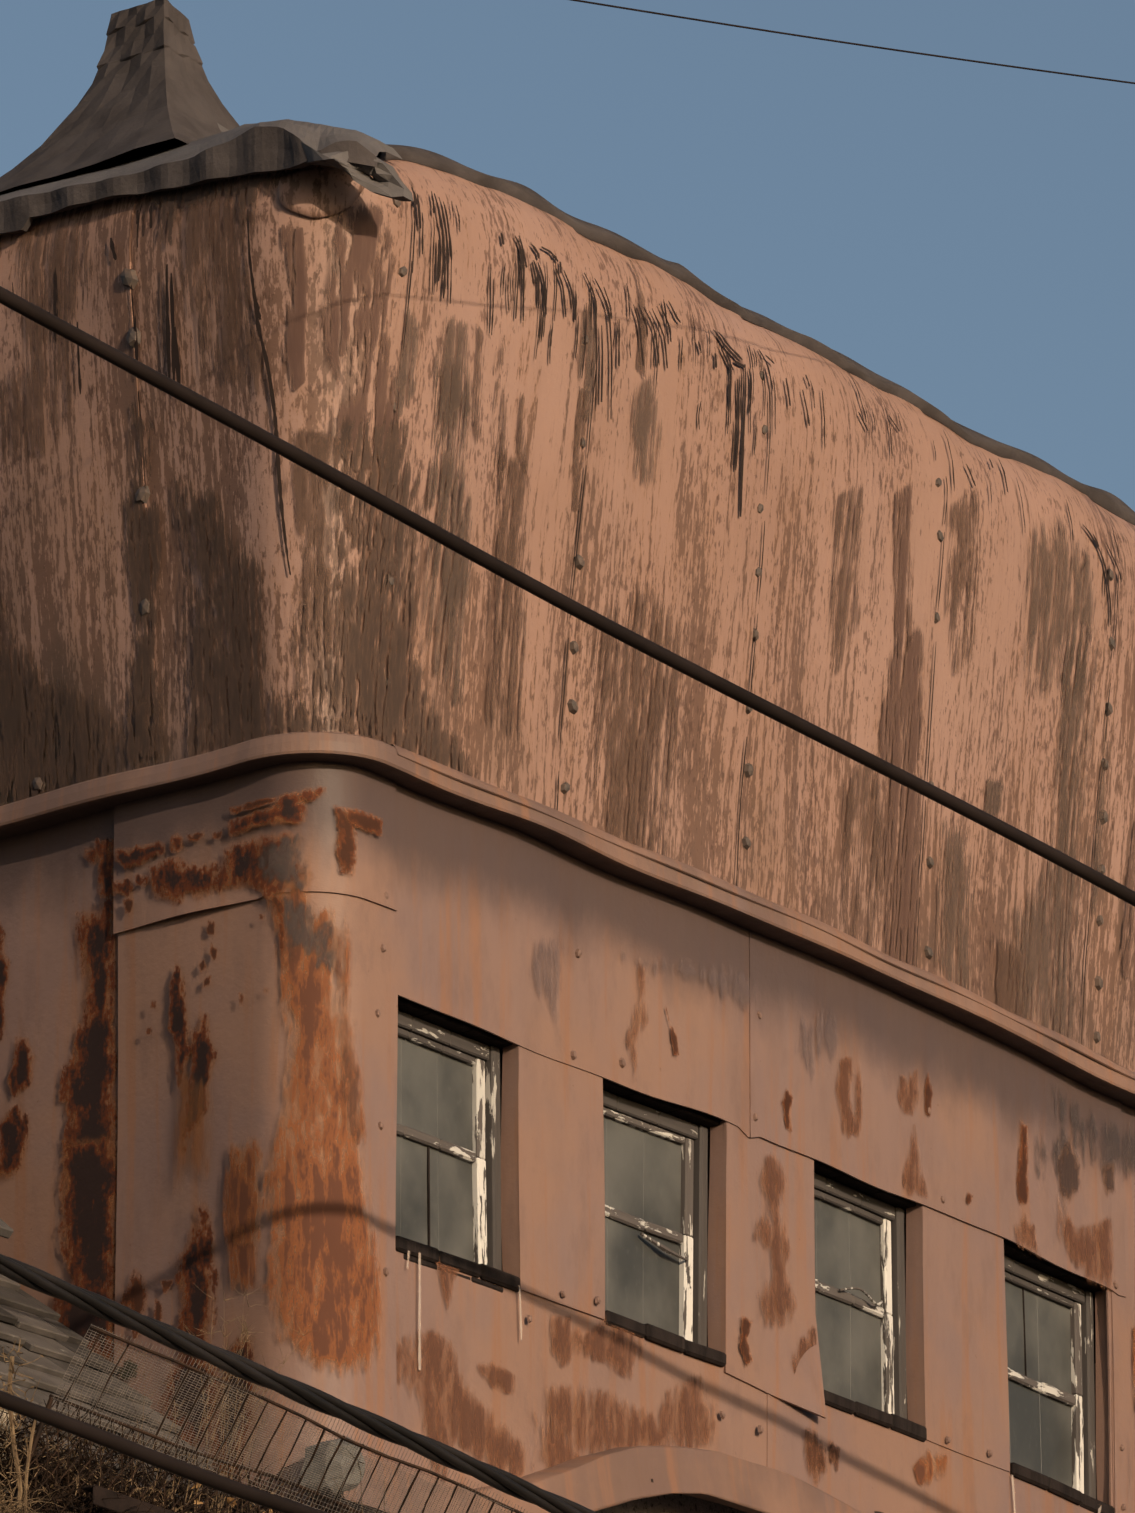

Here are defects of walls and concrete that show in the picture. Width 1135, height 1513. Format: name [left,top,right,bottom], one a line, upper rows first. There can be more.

water stain [0,169,529,806]
crack [247,209,291,575]
water stain [630,260,663,490]
water stain [593,587,682,856]
water stain [843,482,925,966]
water stain [992,518,1111,1036]
corrosion [0,925,32,1175]
corrosion [53,787,383,1375]
corrosion [740,1156,796,1366]
corrosion [782,1091,793,1132]
corrosion [1016,1124,1036,1249]
corrosion [397,1331,523,1476]